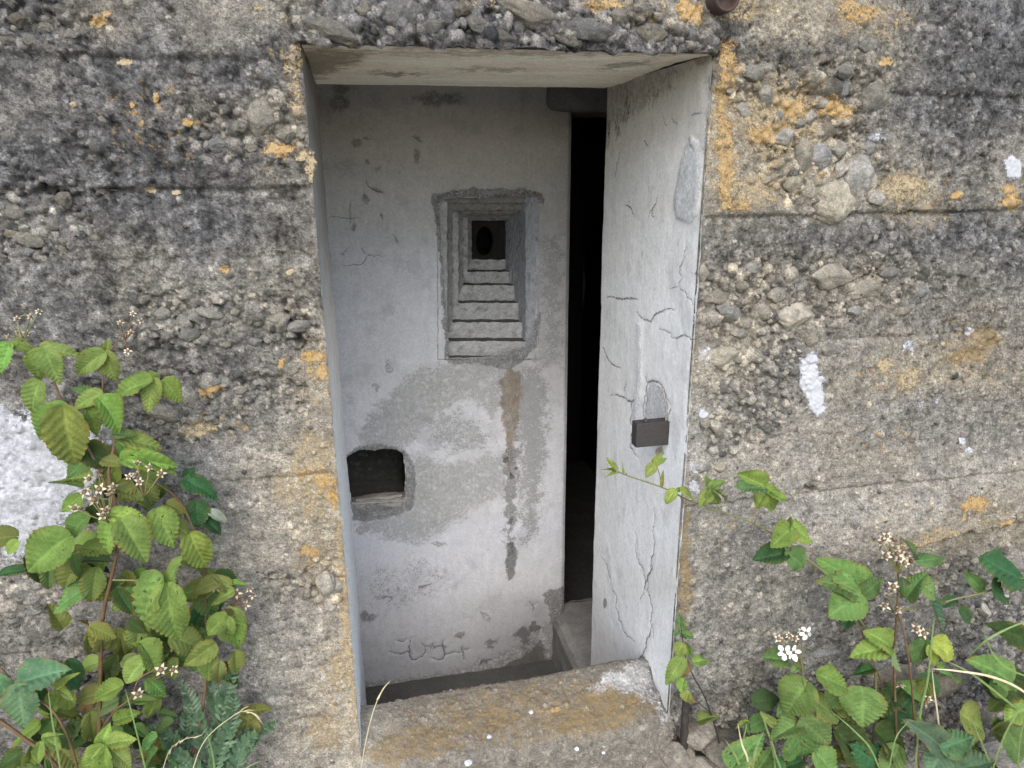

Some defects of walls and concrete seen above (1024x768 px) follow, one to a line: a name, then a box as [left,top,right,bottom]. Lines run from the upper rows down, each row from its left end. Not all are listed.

flaking render [645,383,670,420]
water stain [498,443,523,570]
crack [392,640,466,660]
crack [599,526,655,657]